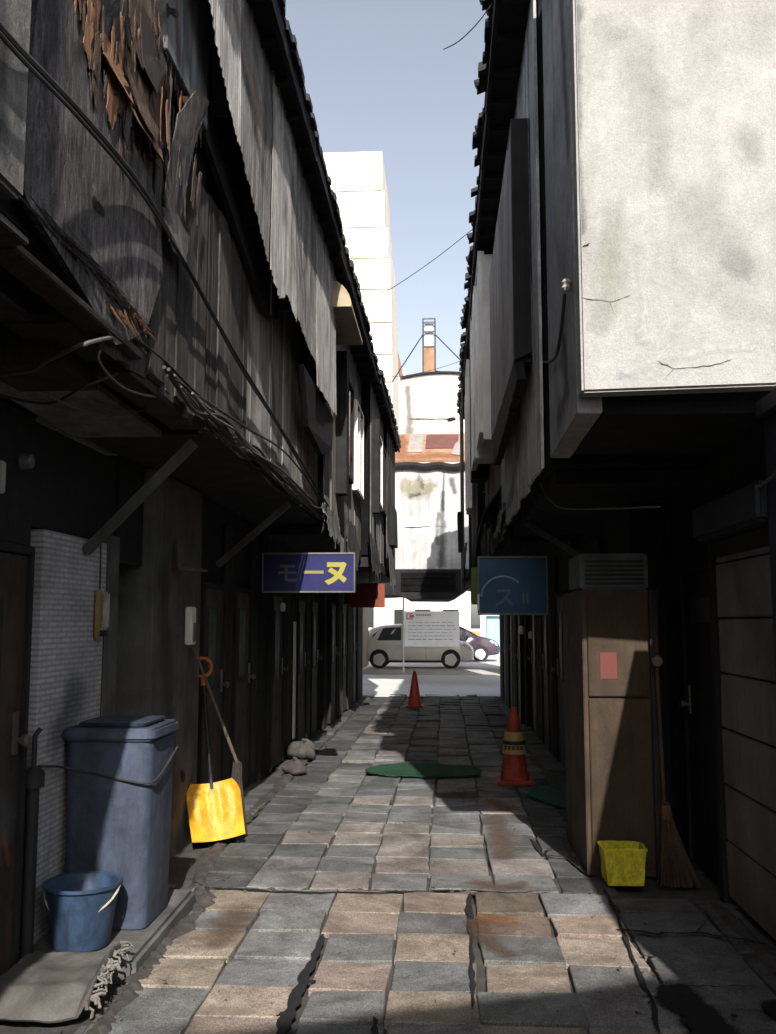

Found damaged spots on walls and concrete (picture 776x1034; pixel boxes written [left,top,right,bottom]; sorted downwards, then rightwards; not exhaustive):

peeling [74,0,202,264]
crack [658,359,732,378]
crack [276,934,325,1034]
crack [192,880,550,1009]
crack [530,839,768,1033]